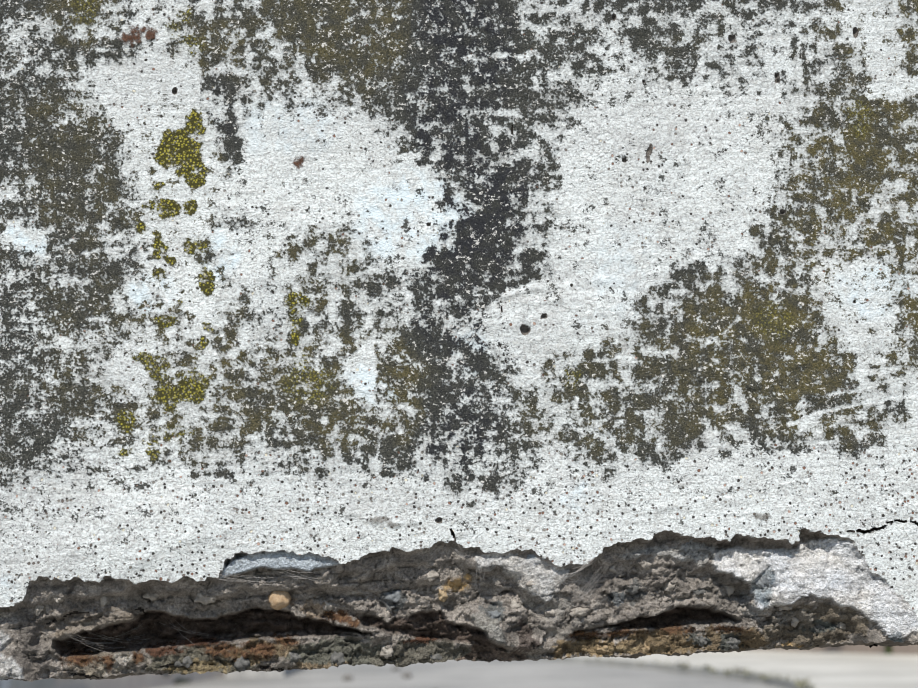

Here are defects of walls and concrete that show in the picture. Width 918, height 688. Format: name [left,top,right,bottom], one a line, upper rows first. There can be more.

damp [177,5,255,179]
damp [0,0,155,491]
damp [371,0,806,500]
crack [846,519,918,535]
rust [61,647,115,673]
spalling [0,528,918,682]
rust [569,623,696,640]